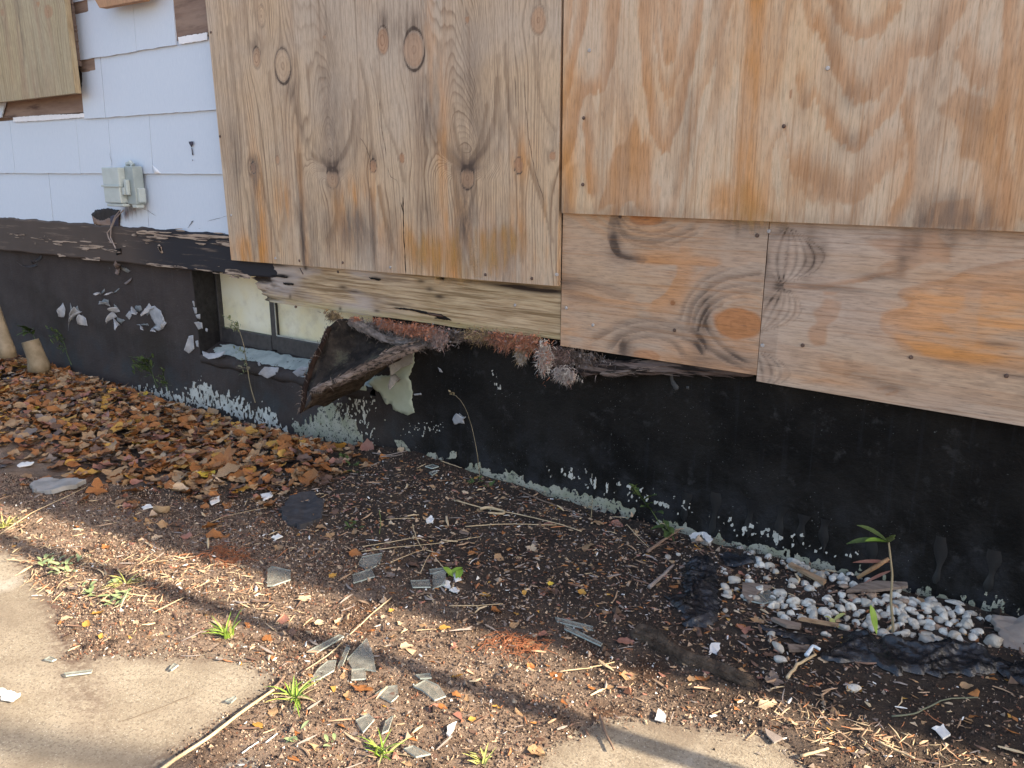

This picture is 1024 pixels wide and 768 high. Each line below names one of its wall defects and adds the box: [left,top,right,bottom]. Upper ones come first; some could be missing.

peeling [14,228,230,332]
peeling [131,301,465,452]
peeling [465,462,863,579]
peeling [902,586,1019,615]